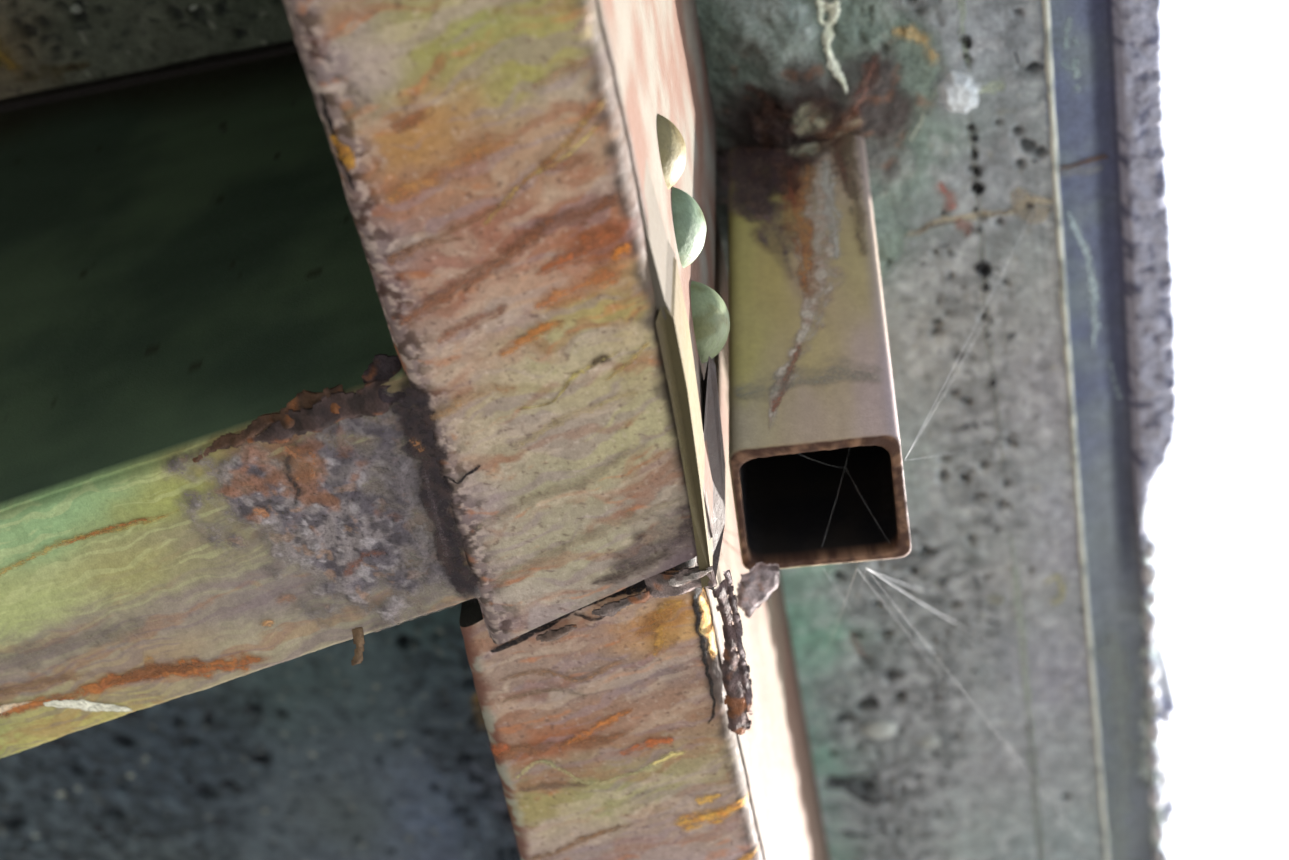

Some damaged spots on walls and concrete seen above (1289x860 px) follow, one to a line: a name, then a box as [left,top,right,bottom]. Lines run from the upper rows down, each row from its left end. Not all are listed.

rust [387,103,602,262]
rust [400,196,631,356]
rust [724,56,879,422]
rust [520,343,648,410]
rust [192,354,479,599]
rust [0,654,262,716]
rust [531,826,624,860]
rust [490,710,684,792]
rust [536,504,780,735]
rust [677,794,748,830]